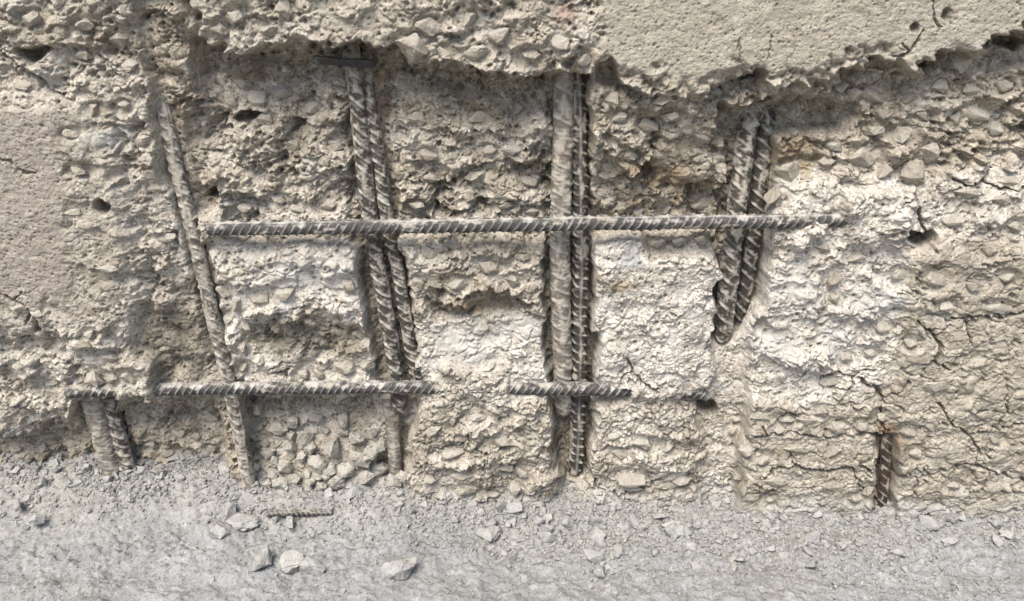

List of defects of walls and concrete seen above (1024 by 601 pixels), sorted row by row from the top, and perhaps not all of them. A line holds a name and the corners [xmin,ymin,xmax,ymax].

crack [892,0,943,58]
spalling [0,0,738,491]
spalling [205,31,1024,520]
crack [620,357,660,393]
crack [589,468,700,500]
crack [745,301,1024,499]